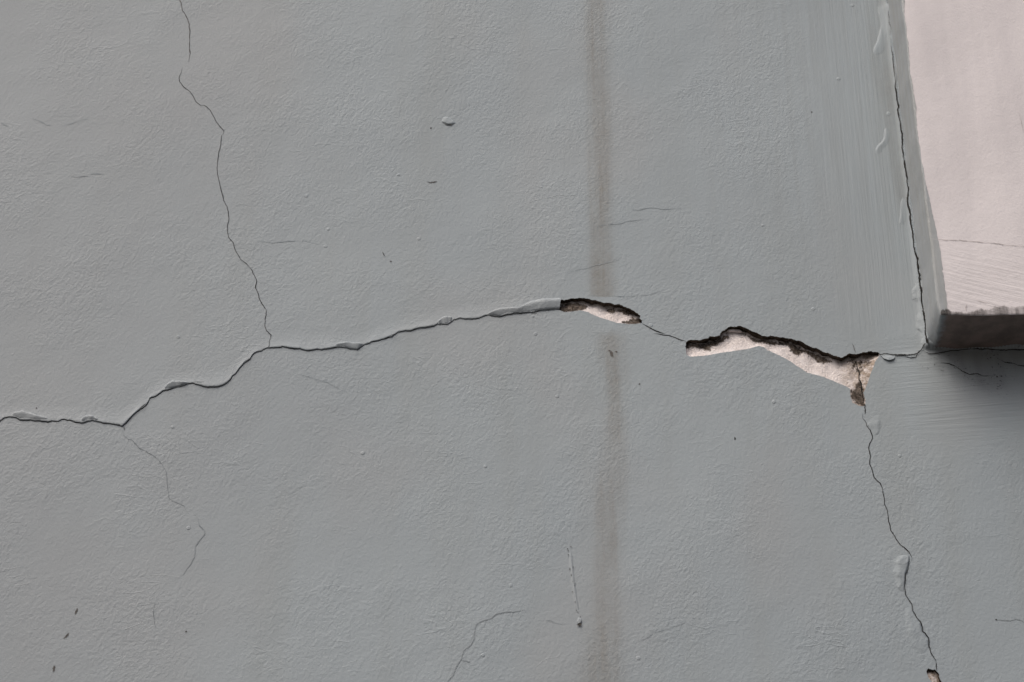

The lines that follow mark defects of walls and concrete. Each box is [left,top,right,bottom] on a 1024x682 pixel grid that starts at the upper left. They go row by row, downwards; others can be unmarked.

crack [852,0,1024,376]
crack [0,0,559,573]
spalling [559,298,642,324]
crack [621,291,684,341]
spalling [685,326,880,406]
crack [862,405,937,669]
crack [447,610,522,682]